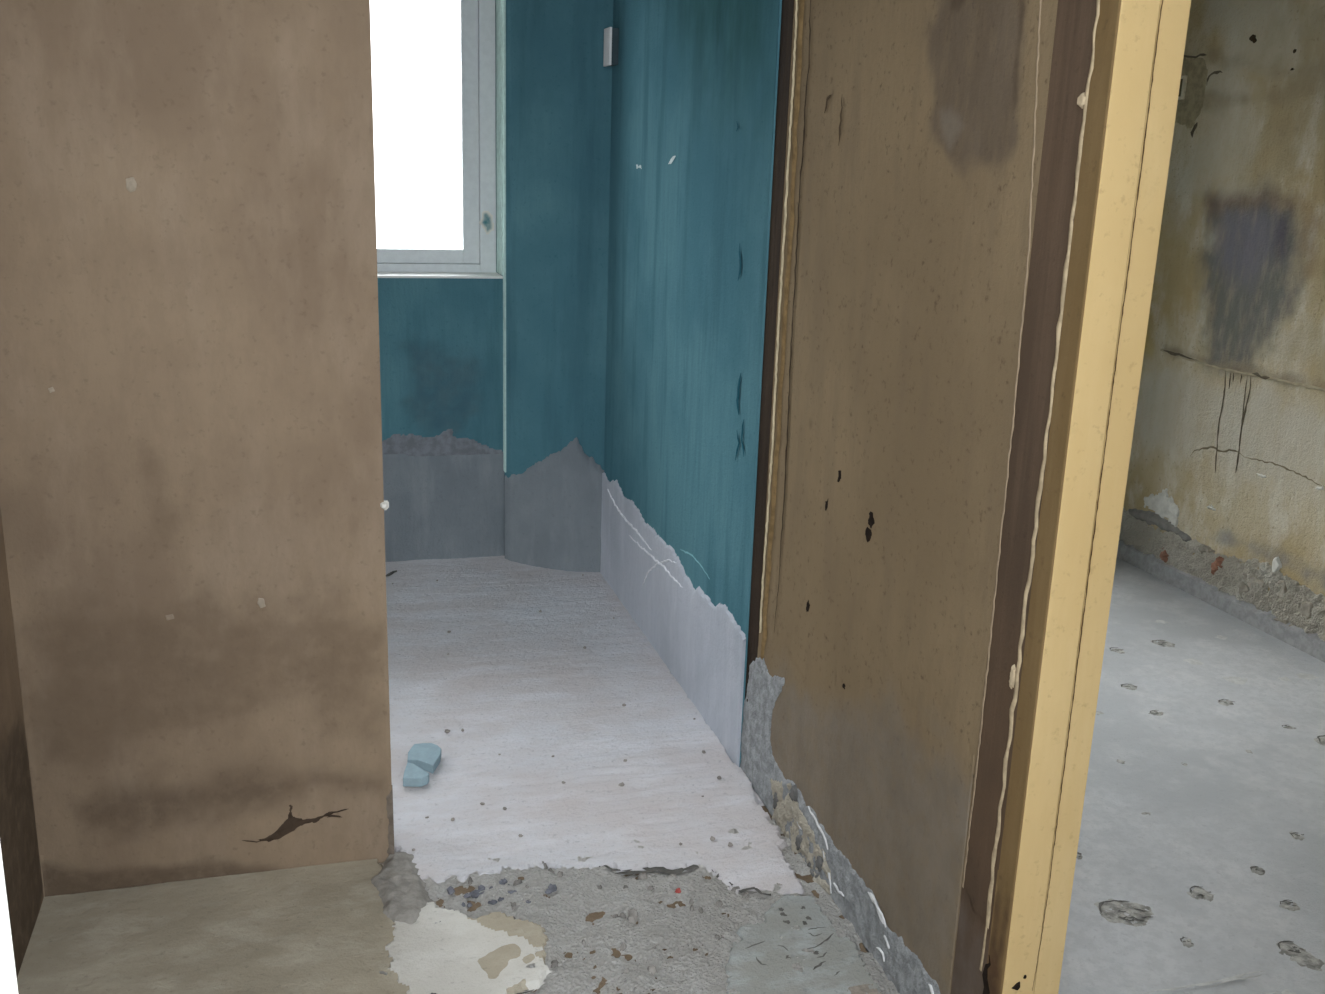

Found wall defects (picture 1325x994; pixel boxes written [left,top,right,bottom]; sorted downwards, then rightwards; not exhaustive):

damp [920,0,1033,186]
damp [1195,191,1313,472]
crack [1190,446,1325,487]
spalling [1119,488,1325,641]
spalling [423,779,900,994]